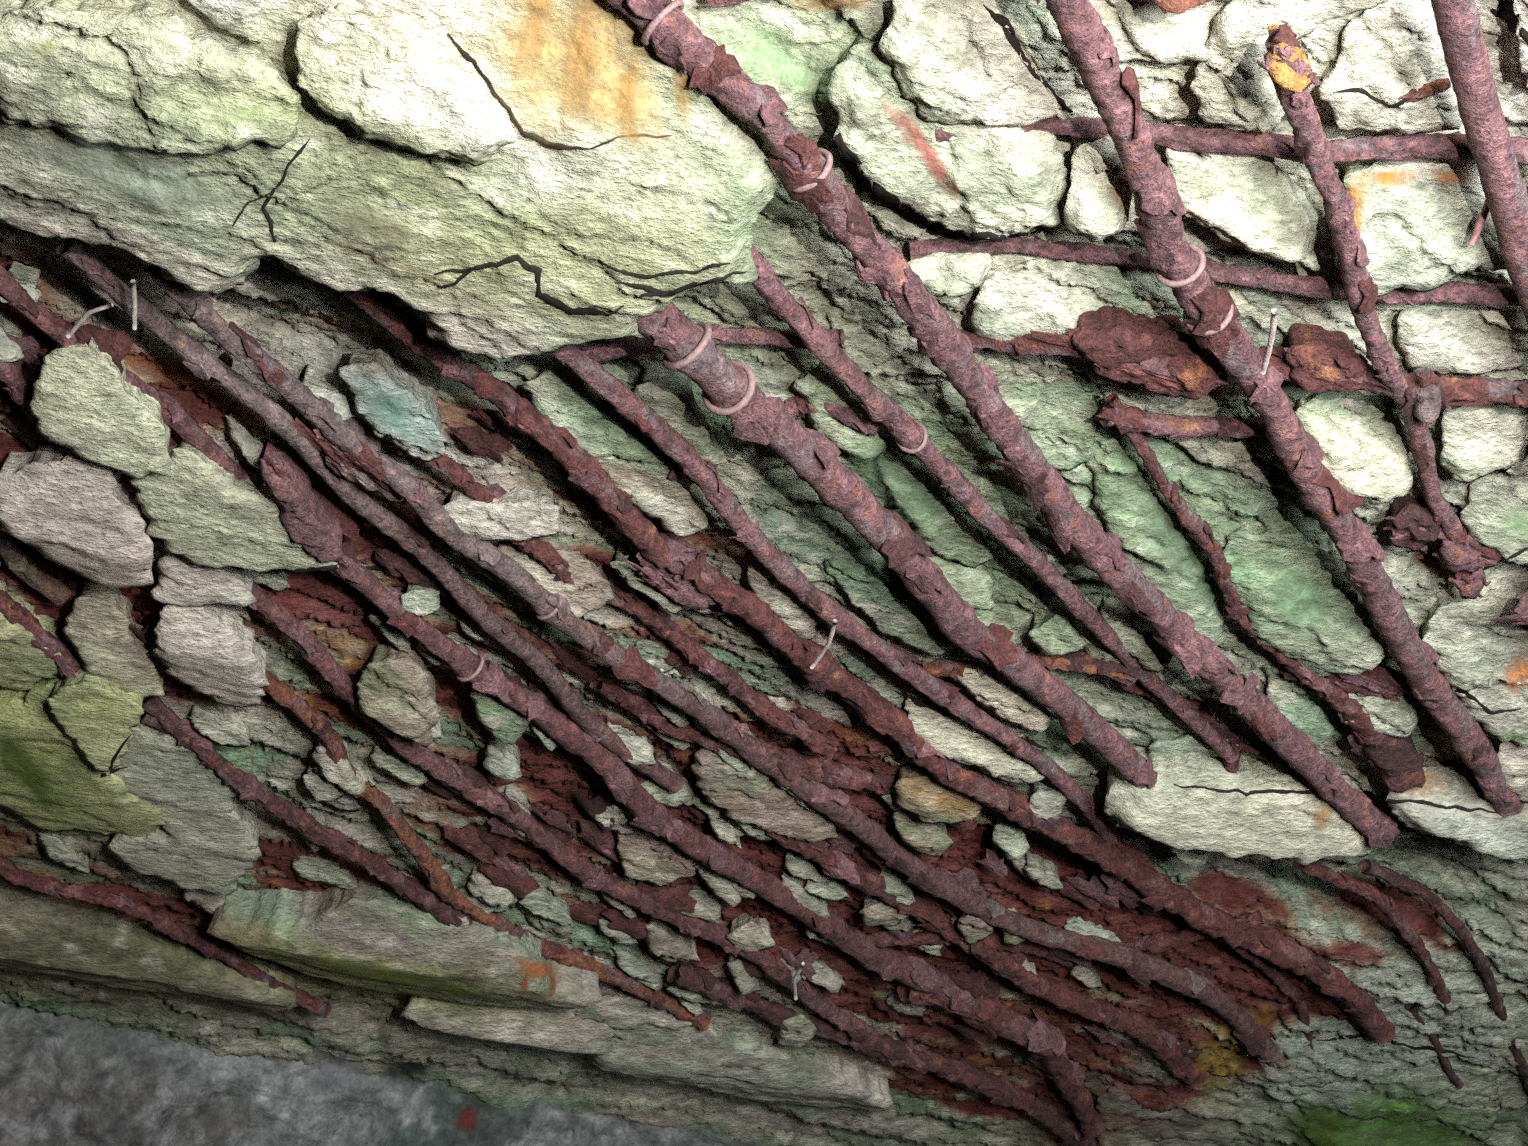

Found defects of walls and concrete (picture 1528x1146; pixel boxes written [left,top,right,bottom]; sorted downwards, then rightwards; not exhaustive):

crack [233,139,310,242]
crack [448,33,672,150]
crack [435,254,747,316]
corrosion [606,0,1528,849]
spalling [827,0,1462,747]
spalling [1342,158,1525,376]
corrosion [0,524,71,605]
spalling [0,337,945,1112]
corrosion [125,266,1396,1146]
spalling [1104,730,1372,867]
spalling [1385,590,1528,860]
corrosion [1292,859,1528,1094]